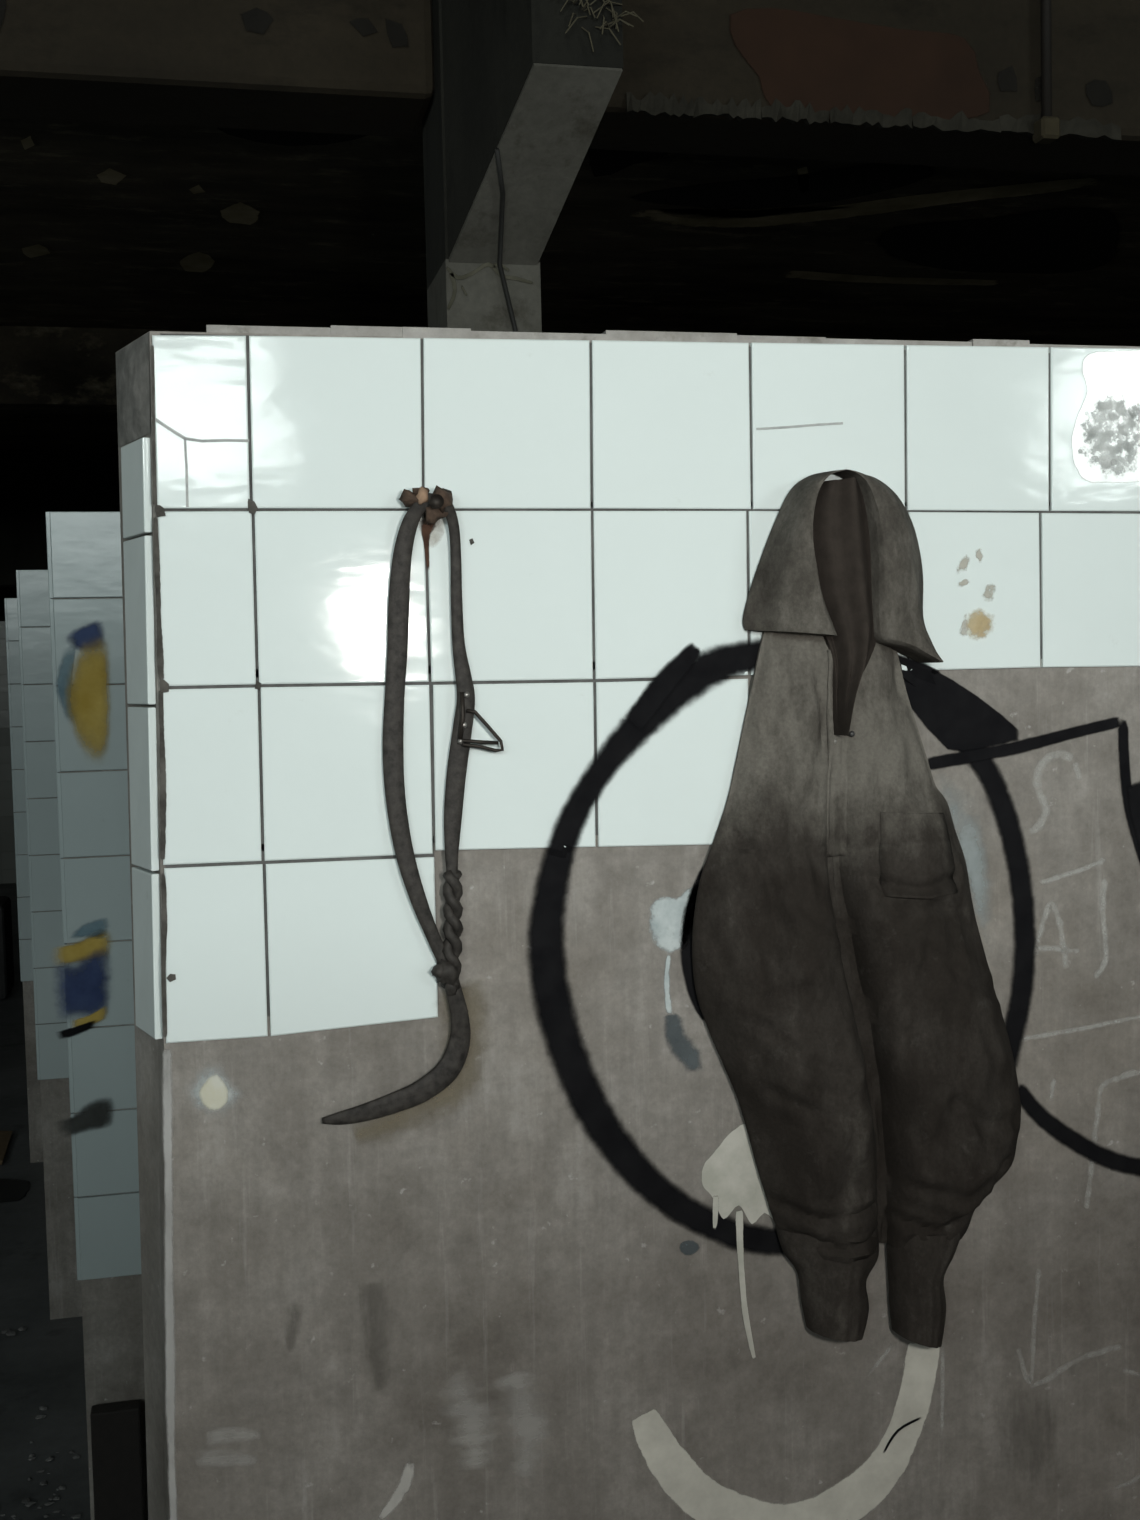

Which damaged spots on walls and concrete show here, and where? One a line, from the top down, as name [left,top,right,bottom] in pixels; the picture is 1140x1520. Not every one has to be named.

corrosion [959,549,982,586]
corrosion [961,585,995,637]